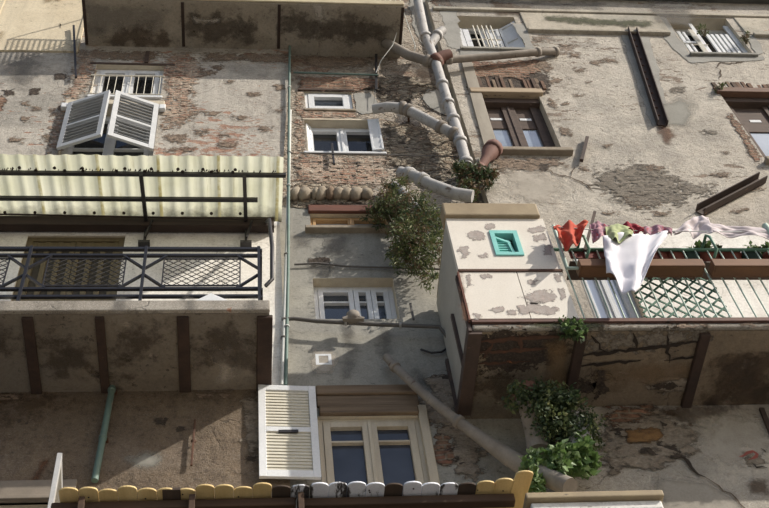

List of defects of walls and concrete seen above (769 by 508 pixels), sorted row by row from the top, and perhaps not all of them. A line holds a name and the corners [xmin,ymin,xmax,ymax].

water stain [87,7,170,47]
water stain [186,13,257,44]
water stain [281,14,388,42]
flaking render [0,48,390,190]
flaking render [724,113,762,162]
flaking render [490,155,732,216]
peeling [457,223,495,259]
peeling [527,225,553,255]
peeling [490,273,566,331]
water stain [652,353,769,424]
spalling [598,404,703,477]
crack [680,453,745,508]